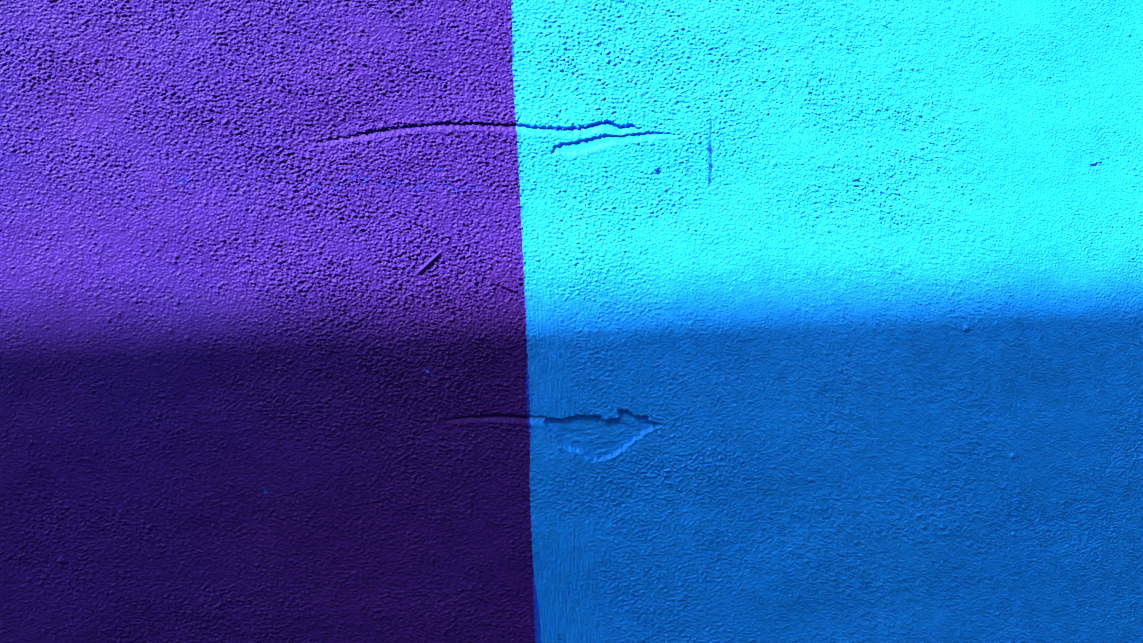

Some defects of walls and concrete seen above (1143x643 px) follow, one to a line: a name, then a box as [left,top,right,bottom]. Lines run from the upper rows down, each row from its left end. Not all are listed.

crack [318,120,673,158]
crack [446,414,546,425]
flaking render [543,409,663,462]